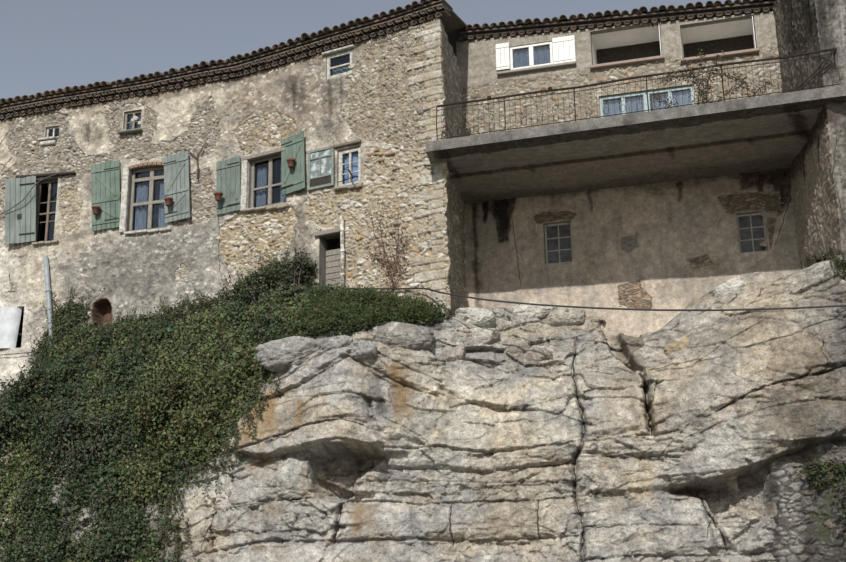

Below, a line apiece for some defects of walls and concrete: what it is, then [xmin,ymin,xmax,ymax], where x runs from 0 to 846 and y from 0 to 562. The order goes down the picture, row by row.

flaking render [0,19,451,312]
water stain [433,96,846,209]
water stain [473,198,516,271]
spalling [530,205,578,224]
spalling [686,251,717,271]
spalling [717,188,785,249]
spalling [617,279,654,311]